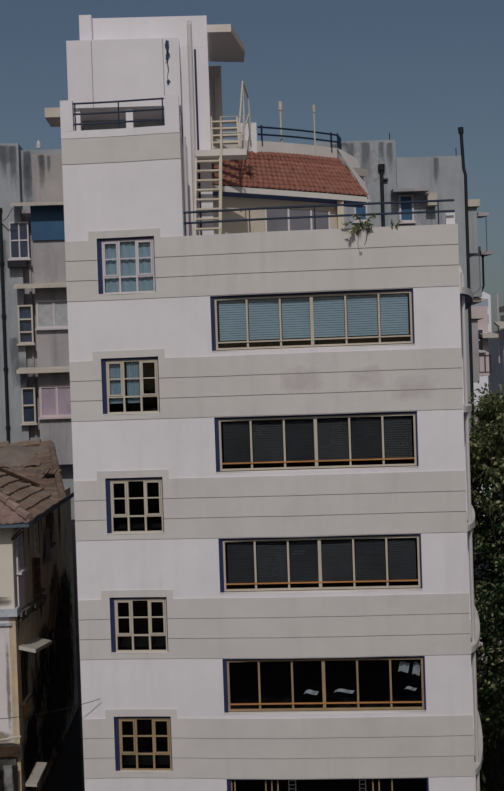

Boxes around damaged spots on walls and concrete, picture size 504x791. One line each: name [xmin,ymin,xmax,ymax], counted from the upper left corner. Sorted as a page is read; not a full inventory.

leakage [339,147,380,180]
leakage [0,571,74,791]